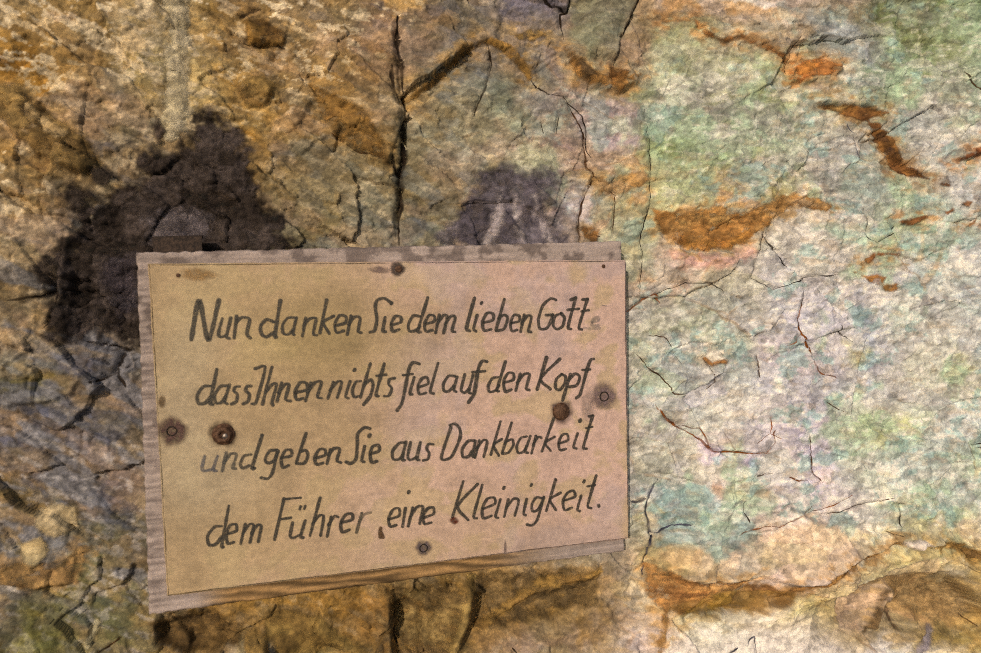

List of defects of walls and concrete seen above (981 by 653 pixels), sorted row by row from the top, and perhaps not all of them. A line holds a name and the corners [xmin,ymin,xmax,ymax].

crack [332,15,407,245]
leakage [433,163,568,246]
crack [532,82,616,237]
crack [626,127,723,312]
crack [751,234,836,378]
crack [636,335,822,482]
crack [742,495,904,537]